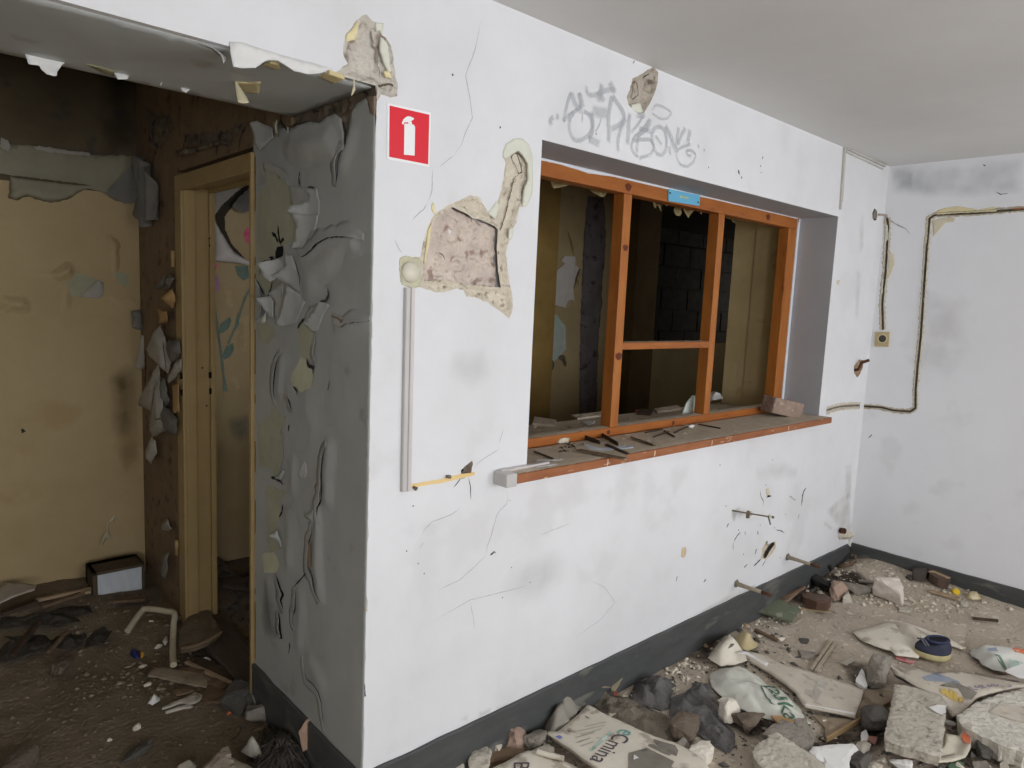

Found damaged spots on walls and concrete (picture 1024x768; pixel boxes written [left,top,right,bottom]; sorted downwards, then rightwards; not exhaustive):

peeling [25,54,64,76]
peeling [0,138,159,227]
peeling [87,64,129,79]
peeling [198,15,398,395]
crack [413,22,481,219]
flaking render [399,138,533,318]
flaking render [627,67,658,114]
peeling [131,273,182,463]